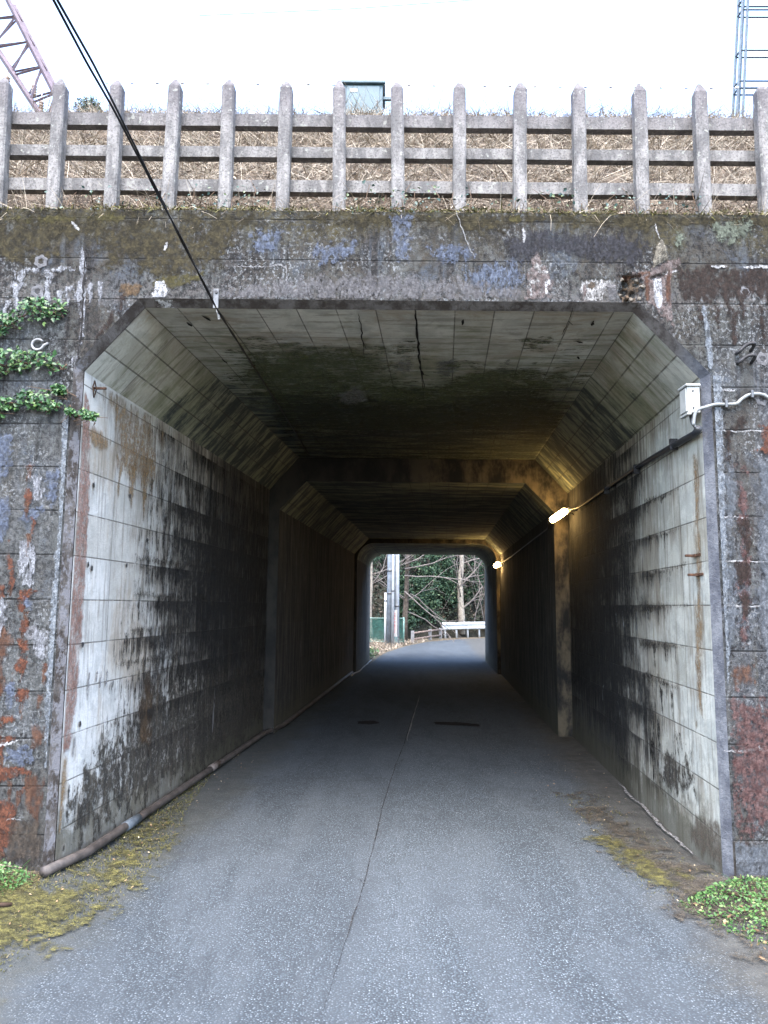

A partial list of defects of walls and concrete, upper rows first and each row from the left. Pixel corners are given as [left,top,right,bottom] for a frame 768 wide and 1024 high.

spalling [580,270,677,302]
crack [407,309,429,388]
corrosion [23,464,36,546]
leakage [63,394,269,852]
leakage [567,448,696,800]
corrosion [0,555,47,861]
leakage [691,817,722,869]